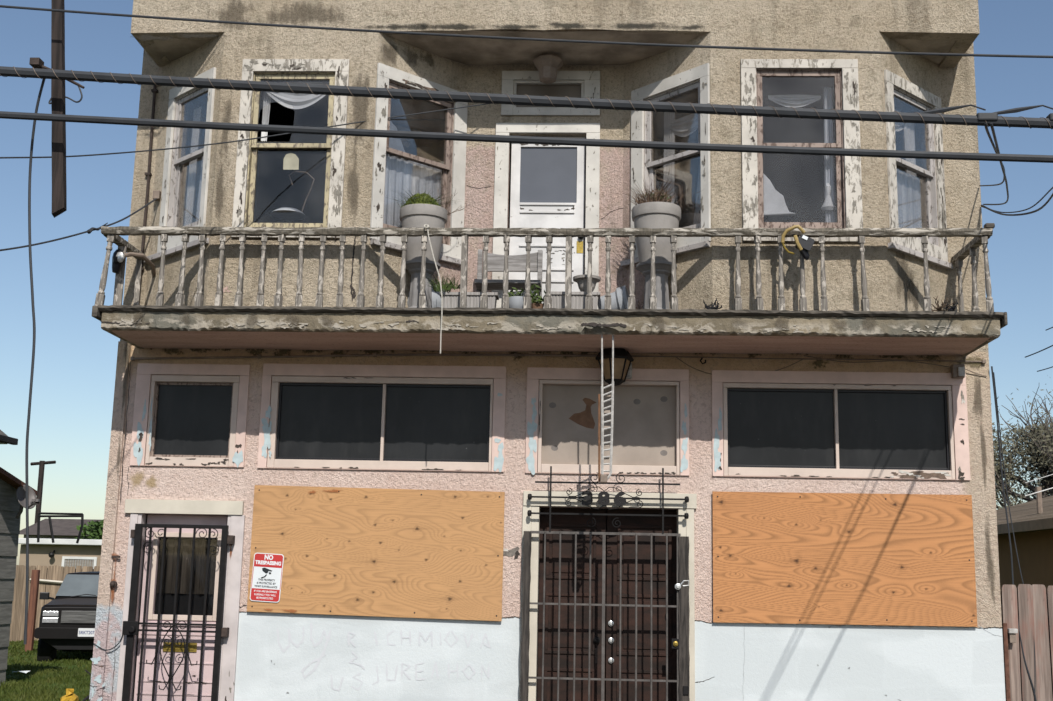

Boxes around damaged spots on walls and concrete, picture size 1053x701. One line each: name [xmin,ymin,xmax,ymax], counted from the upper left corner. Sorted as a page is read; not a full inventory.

damp [271,5,340,22]
peeling [844,72,858,107]
crack [349,237,357,301]
peeling [224,320,308,329]
peeling [332,321,399,329]
peeling [133,397,243,468]
peeling [872,467,965,481]
damp [986,532,994,593]